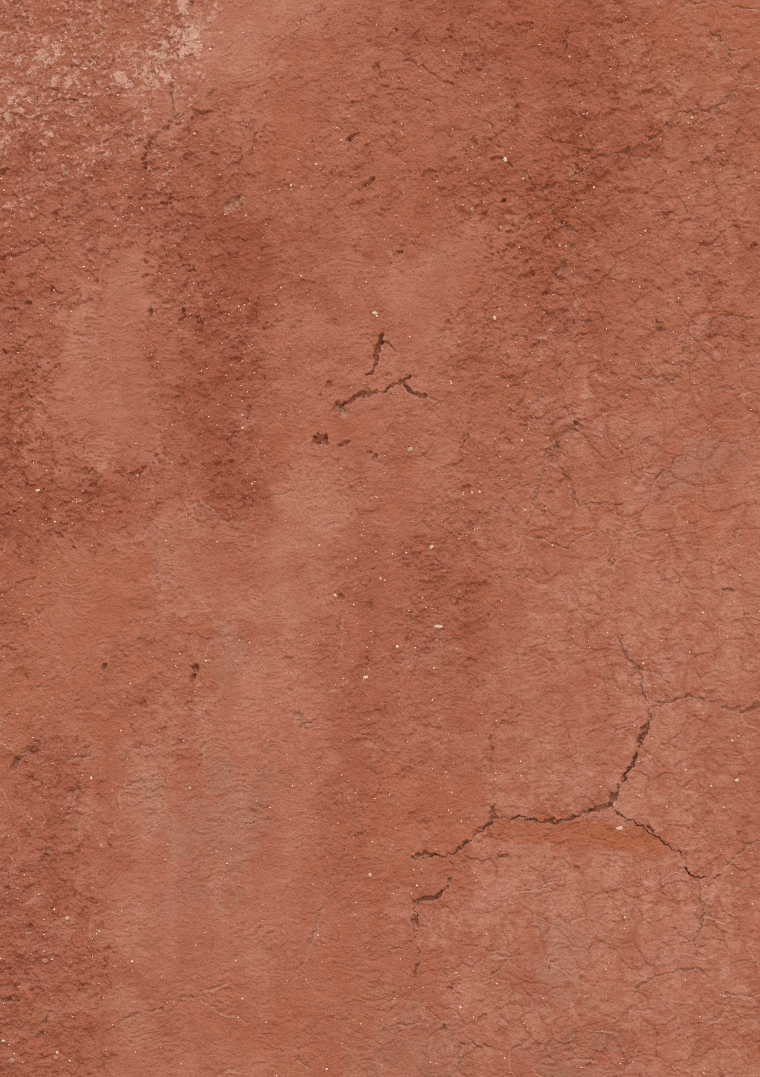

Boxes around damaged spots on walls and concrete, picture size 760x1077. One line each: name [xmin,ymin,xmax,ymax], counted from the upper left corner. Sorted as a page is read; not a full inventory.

crack [343,334,441,405]
crack [541,637,664,825]
crack [724,702,760,729]
crack [391,806,496,969]
crack [691,839,760,937]